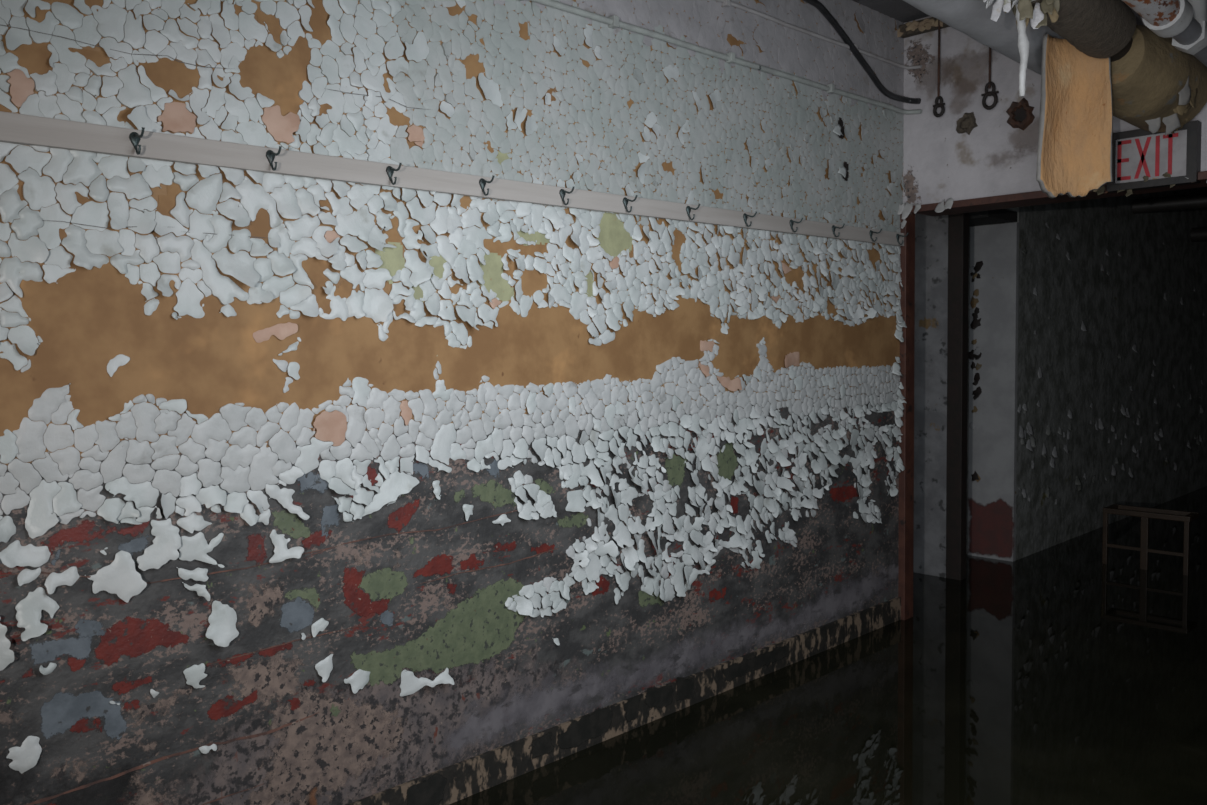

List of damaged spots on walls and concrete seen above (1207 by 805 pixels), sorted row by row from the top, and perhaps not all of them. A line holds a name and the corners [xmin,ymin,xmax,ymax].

flaking render [0,0,429,161]
peeling [446,0,538,135]
peeling [545,88,556,105]
spalling [820,96,868,139]
spalling [895,19,937,83]
peeling [484,141,512,165]
peeling [625,112,676,197]
flaking render [0,145,953,671]
peeling [39,662,57,675]
peeling [6,736,42,773]